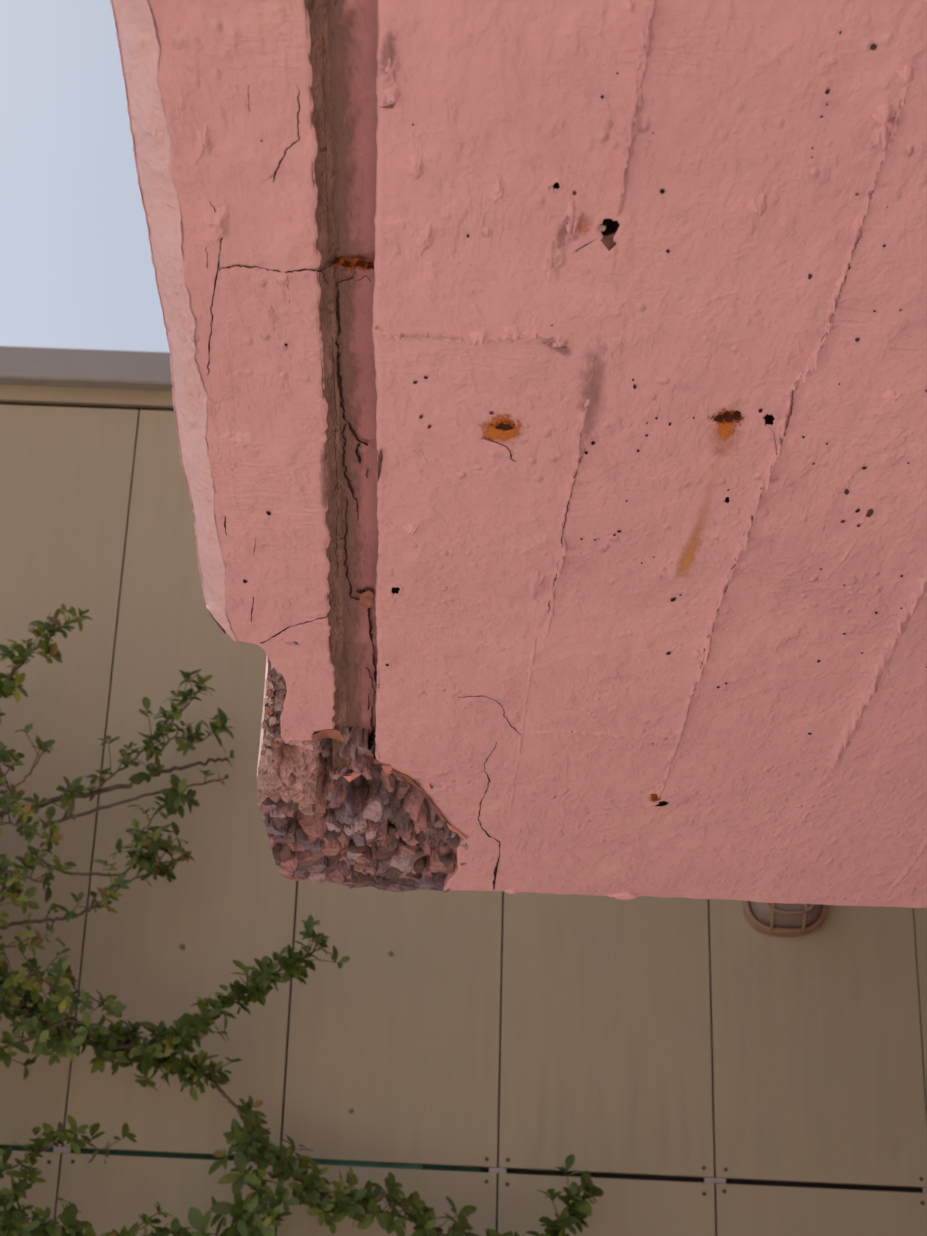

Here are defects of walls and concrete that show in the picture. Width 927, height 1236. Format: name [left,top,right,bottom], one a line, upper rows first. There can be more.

corrosion [333,256,374,270]
crack [205,37,380,760]
corrosion [481,415,521,442]
corrosion [710,409,744,441]
spalling [257,656,468,893]
crack [461,696,521,890]